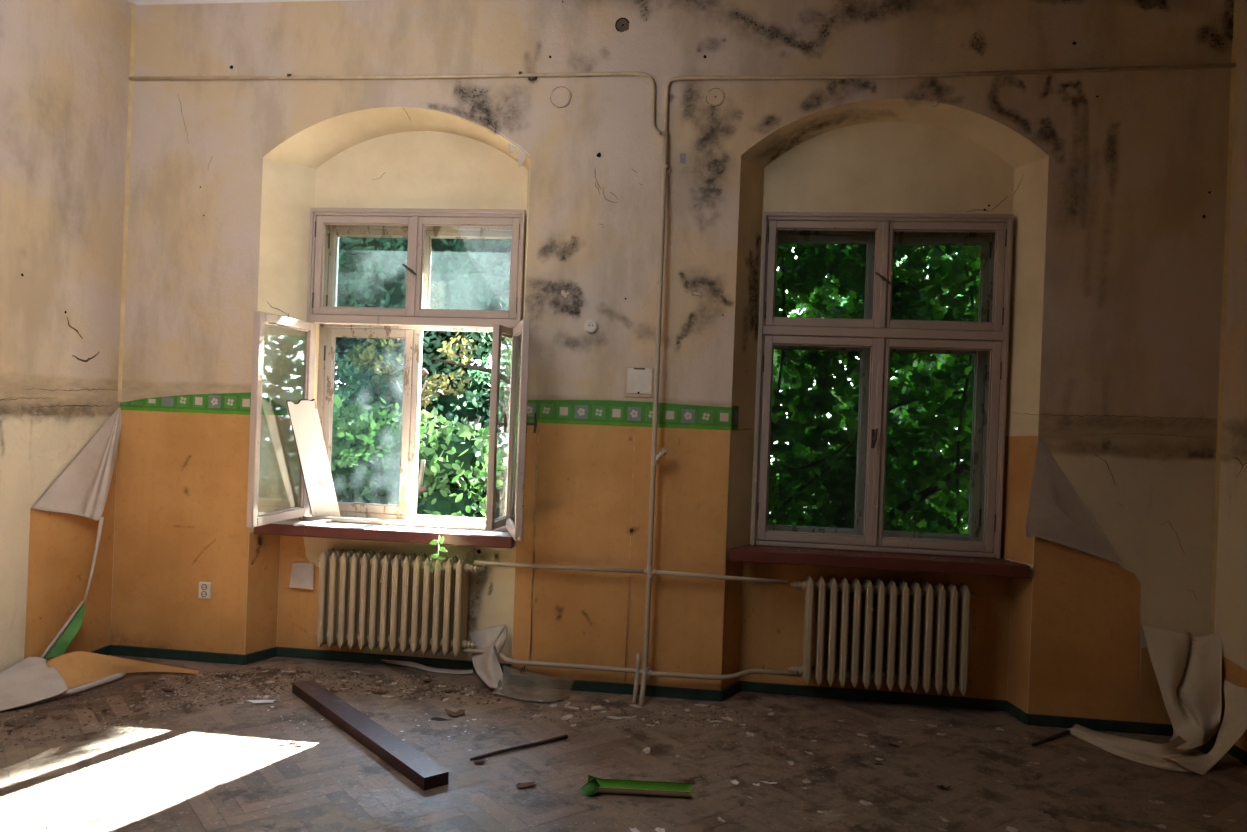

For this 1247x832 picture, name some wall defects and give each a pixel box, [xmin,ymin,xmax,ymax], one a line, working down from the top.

water stain [456,89,497,132]
water stain [543,284,582,315]
peeling [31,407,122,659]
peeling [1026,437,1125,566]